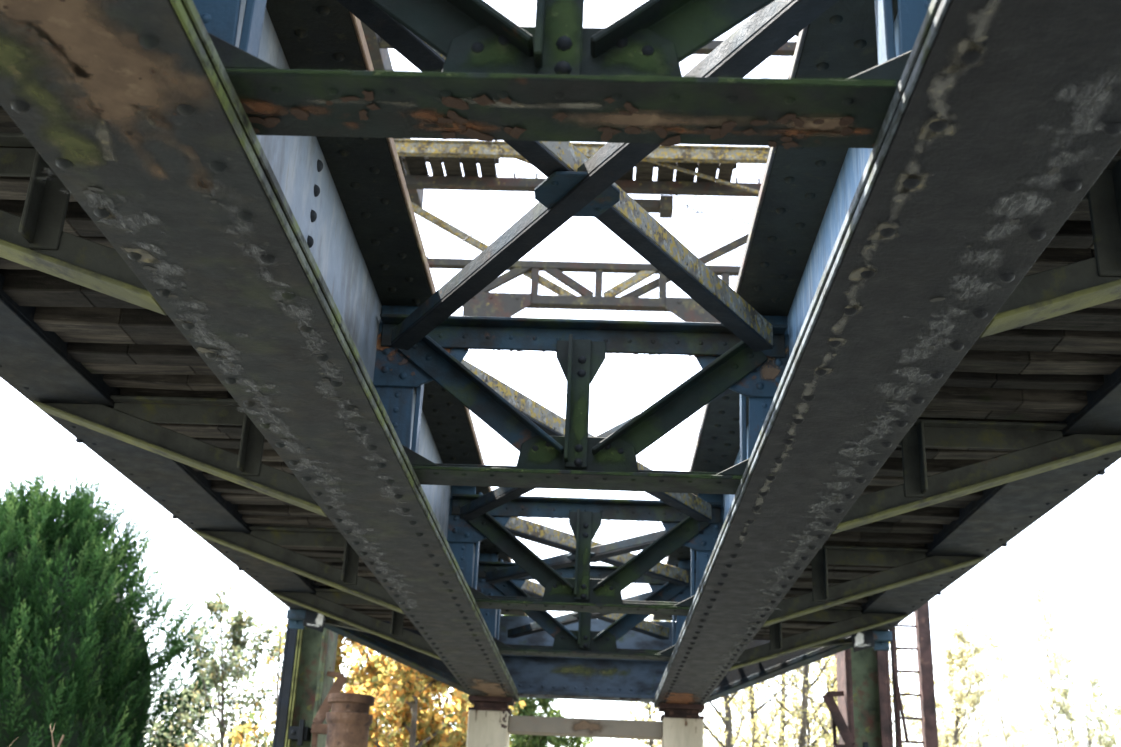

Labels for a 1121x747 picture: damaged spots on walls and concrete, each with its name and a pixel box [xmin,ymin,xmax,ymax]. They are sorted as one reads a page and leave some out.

peeling [83,179,416,610]
corrosion [240,101,309,133]
peeling [696,276,993,699]
peeling [739,0,998,544]
peeling [966,77,1115,266]